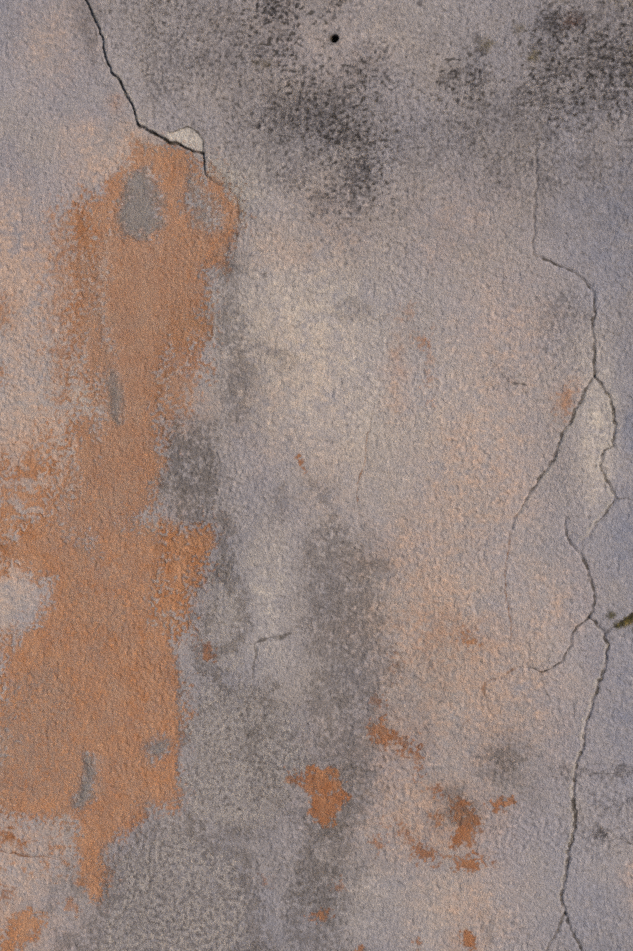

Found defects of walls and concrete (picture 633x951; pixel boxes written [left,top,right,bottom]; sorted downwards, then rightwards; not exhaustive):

crack [86,0,216,183]
crack [523,237,616,528]
peeling [0,127,246,901]
peeling [287,765,352,827]
peeling [411,784,516,872]
crack [512,530,633,951]
peeling [0,907,48,951]